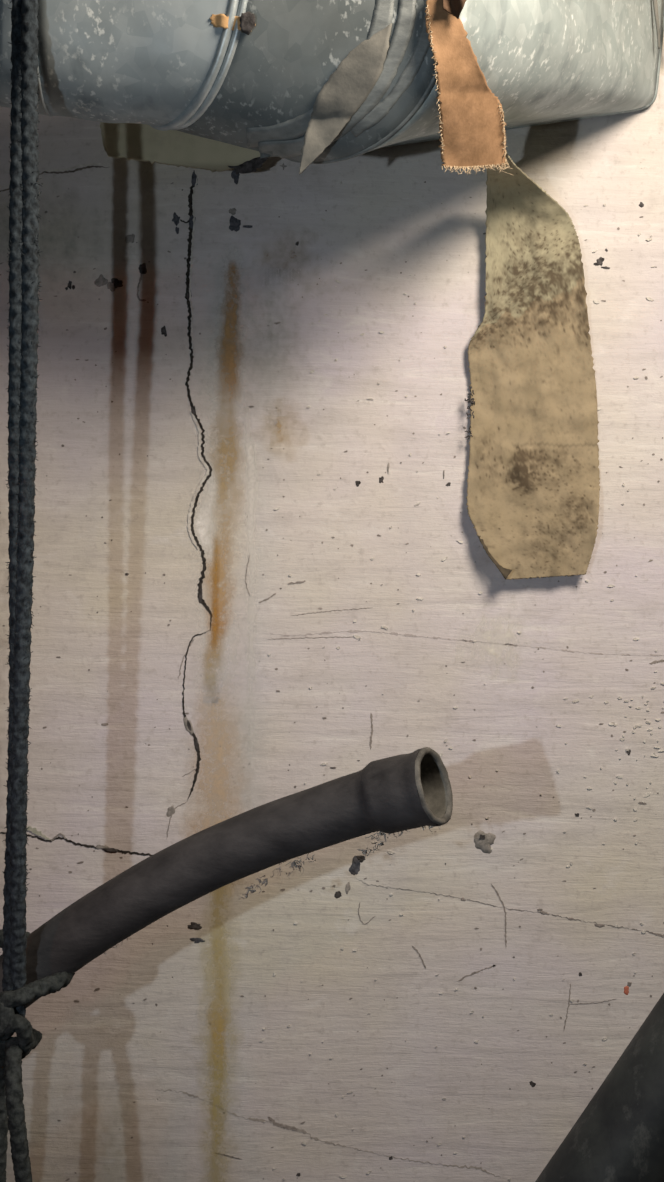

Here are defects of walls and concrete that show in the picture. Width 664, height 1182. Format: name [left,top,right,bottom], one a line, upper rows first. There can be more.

crack [39,163,108,175]
rust [221,266,238,401]
crack [0,171,213,856]
rust [207,426,237,667]